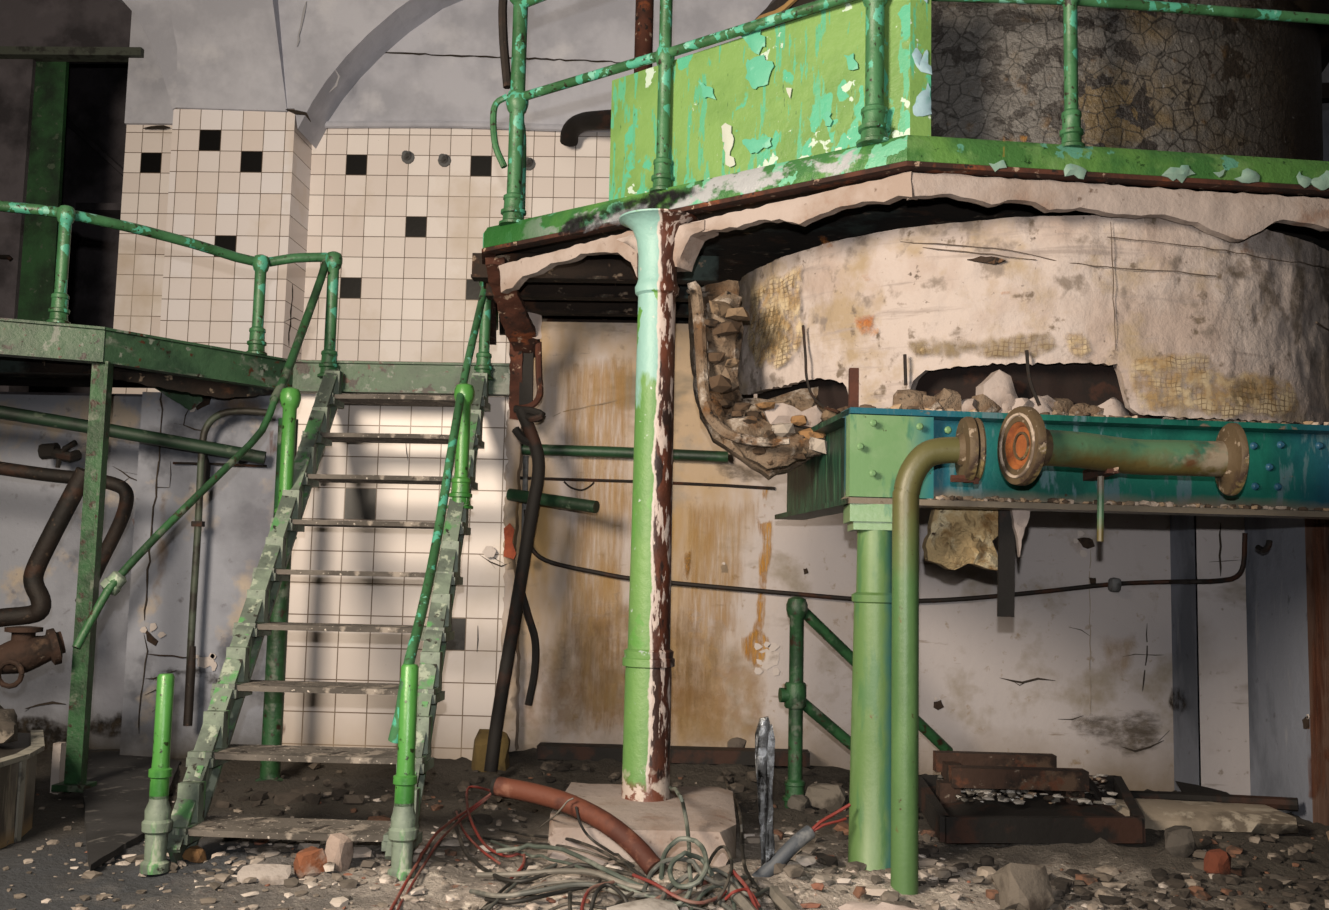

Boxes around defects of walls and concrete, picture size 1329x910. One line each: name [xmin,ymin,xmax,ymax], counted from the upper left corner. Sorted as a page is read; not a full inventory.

peeling [698,81,716,100]
peeling [741,30,774,89]
peeling [844,53,858,70]
peeling [912,43,932,117]
peeling [721,123,772,167]
spalling [691,160,1329,242]
spalling [498,231,638,294]
crack [114,392,201,731]
crack [1002,678,1055,686]
crack [1061,550,1091,720]
crack [1123,628,1157,691]
water stain [1083,715,1154,753]